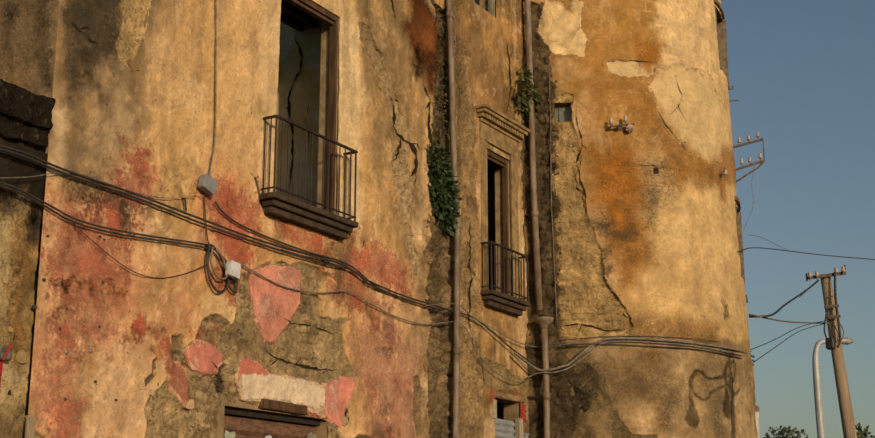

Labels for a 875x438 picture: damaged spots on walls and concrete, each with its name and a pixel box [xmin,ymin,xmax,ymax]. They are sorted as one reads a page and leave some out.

rust [403,0,439,95]
peeling [537,0,588,57]
crack [391,85,433,183]
peeling [602,58,731,165]
rust [645,102,736,201]
spalling [550,90,636,342]
peeling [38,143,162,438]
crack [559,274,634,331]
peeling [132,314,269,410]